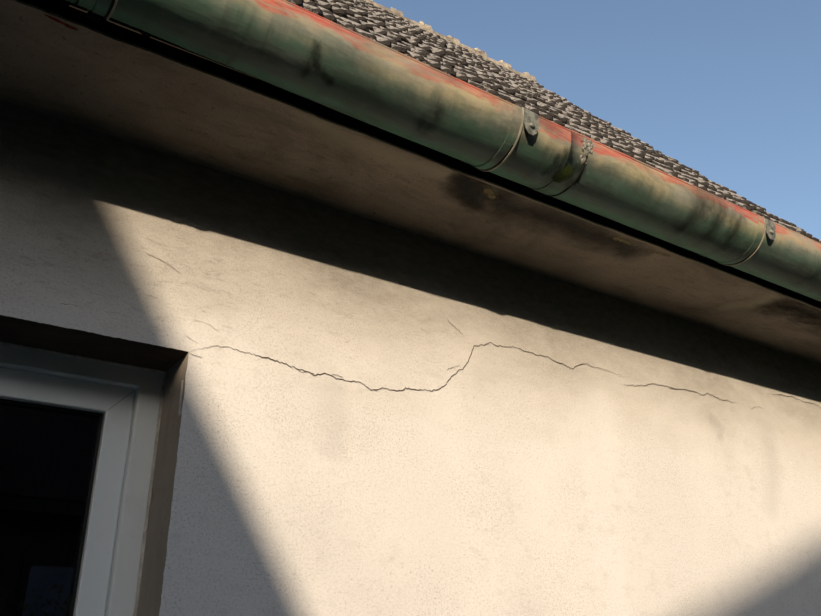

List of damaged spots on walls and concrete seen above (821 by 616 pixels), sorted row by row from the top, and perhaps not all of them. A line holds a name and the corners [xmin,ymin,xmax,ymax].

water stain [280,108,640,256]
water stain [707,290,821,326]
crack [187,319,764,409]